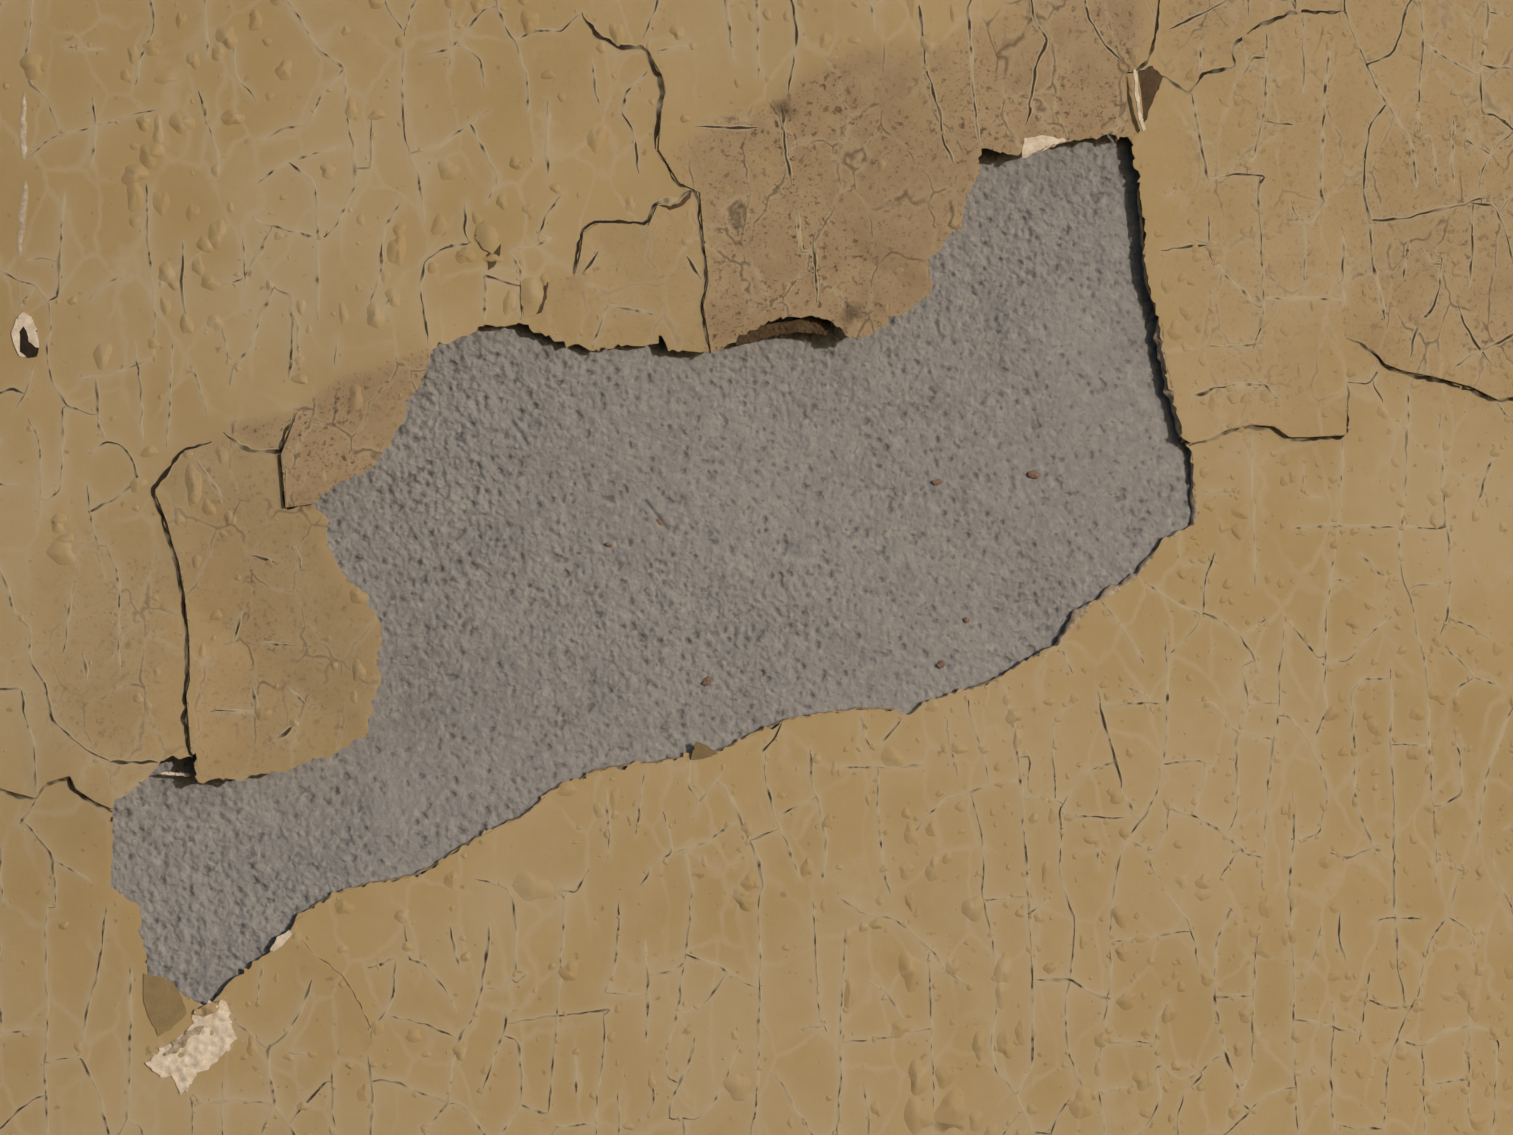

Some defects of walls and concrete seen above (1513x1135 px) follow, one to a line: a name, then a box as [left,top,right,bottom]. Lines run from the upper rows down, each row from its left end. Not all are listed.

crack [868,0,981,165]
peeling [11,312,39,358]
peeling [0,613,189,809]
crack [0,0,819,1135]
peeling [109,0,1347,1096]
crack [916,0,1513,1135]
crack [190,712,967,1135]